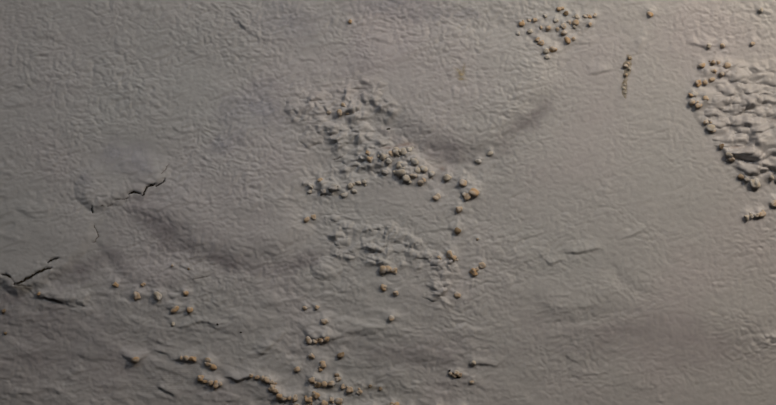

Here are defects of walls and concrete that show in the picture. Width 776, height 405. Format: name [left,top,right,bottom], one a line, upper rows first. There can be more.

crack [91,165,168,243]
crack [2,258,57,287]